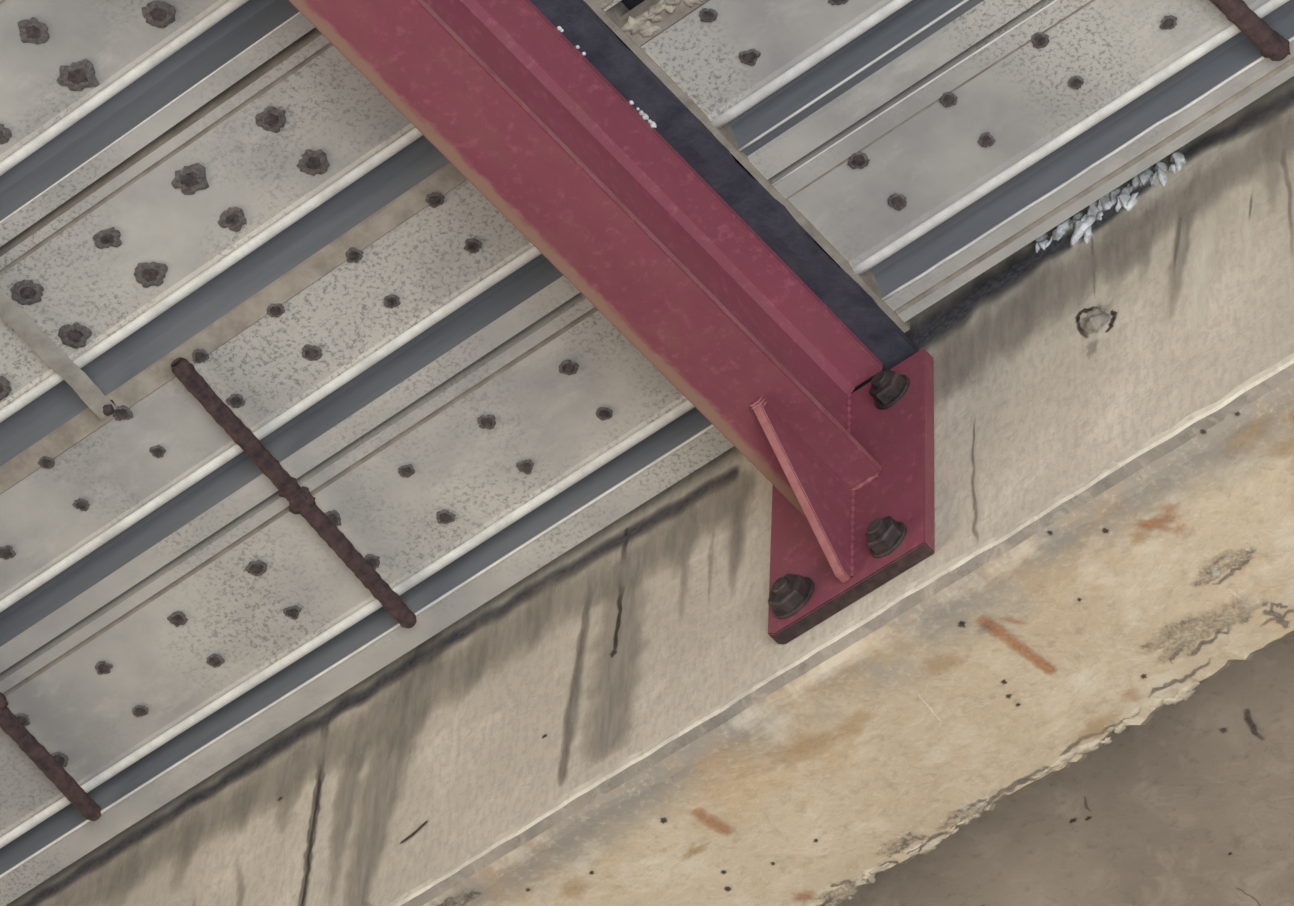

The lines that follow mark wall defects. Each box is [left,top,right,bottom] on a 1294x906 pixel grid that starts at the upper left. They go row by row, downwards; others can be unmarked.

rust [1209,0,1291,61]
damp [906,91,1294,391]
rust [171,357,417,629]
crack [971,429,979,537]
damp [22,468,748,906]
rust [979,618,1055,673]
spalling [1144,599,1289,661]
spalling [1193,549,1254,585]
rust [0,692,101,821]
spalling [808,681,1200,906]